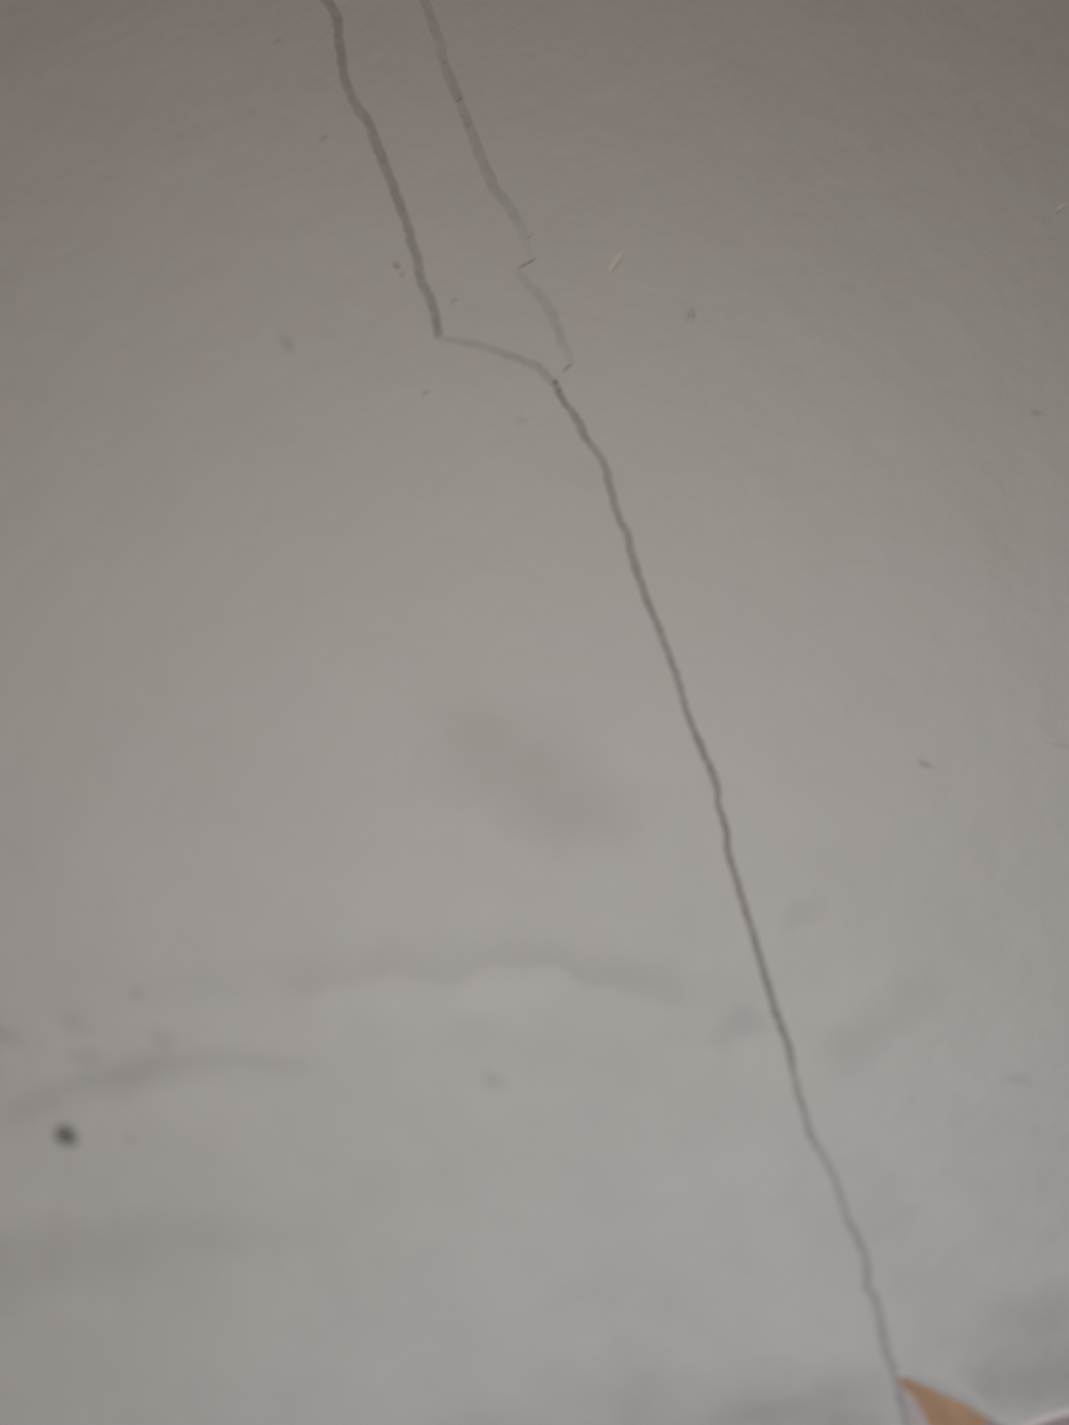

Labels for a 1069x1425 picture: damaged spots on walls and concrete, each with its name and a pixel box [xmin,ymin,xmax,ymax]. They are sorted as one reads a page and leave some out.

crack [320,0,910,1425]
peeling [894,1370,1069,1425]